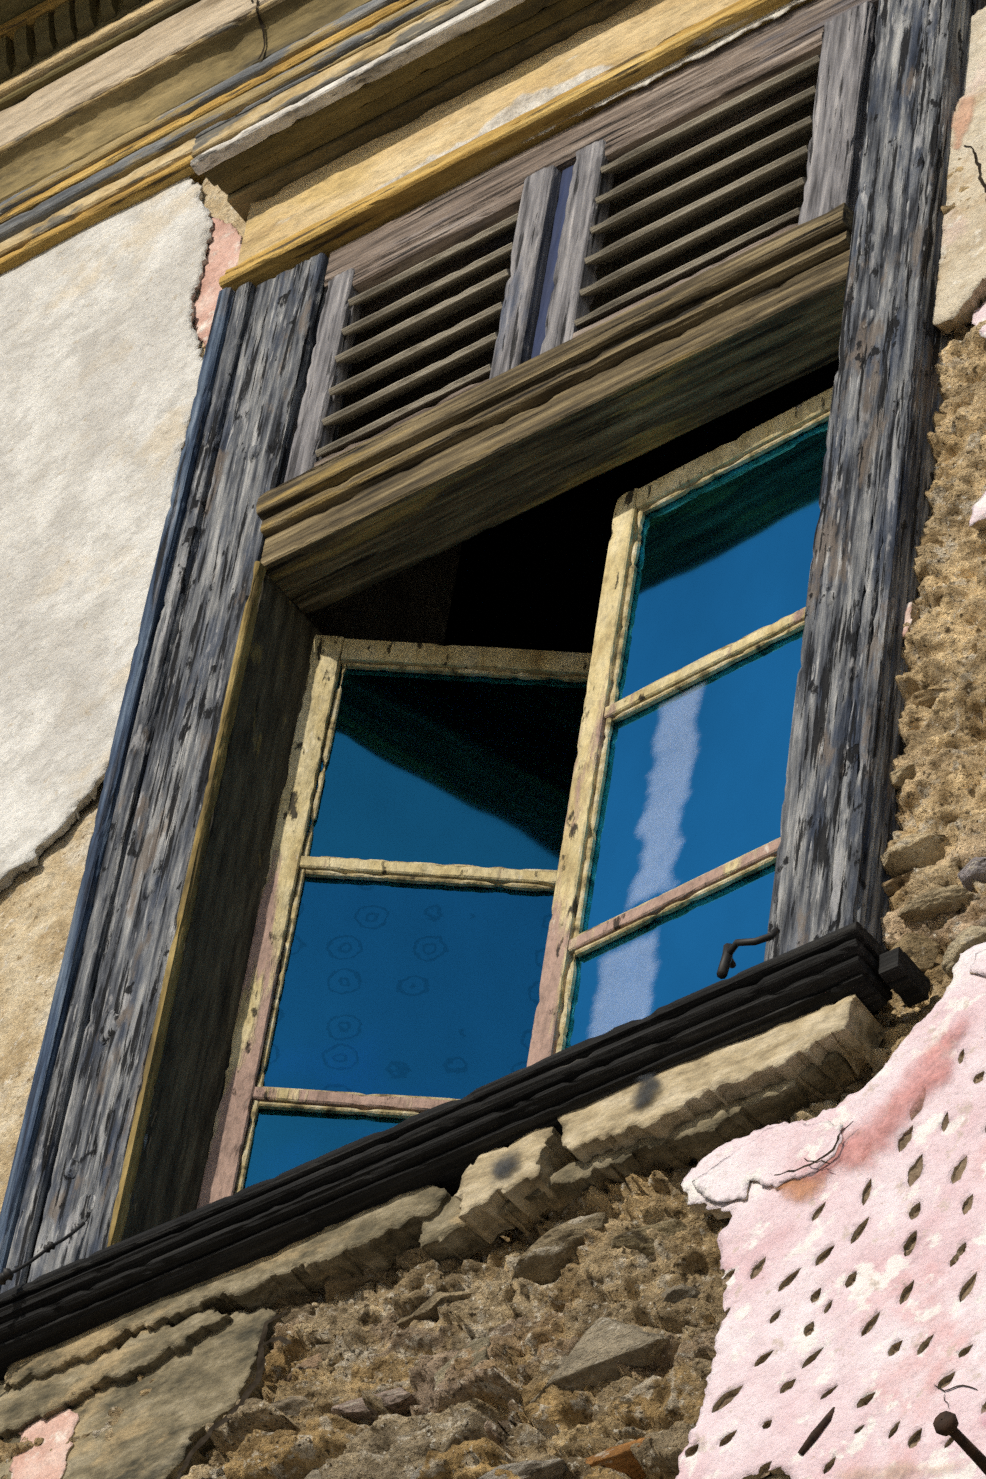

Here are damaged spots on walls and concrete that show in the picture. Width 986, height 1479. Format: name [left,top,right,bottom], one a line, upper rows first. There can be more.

crack [251,0,265,60]
spalling [941,158,985,215]
crack [964,145,986,200]
peeling [194,178,246,353]
spalling [181,298,986,1479]
peeling [0,781,104,1213]
crack [774,1121,853,1176]
peeling [0,1392,124,1479]